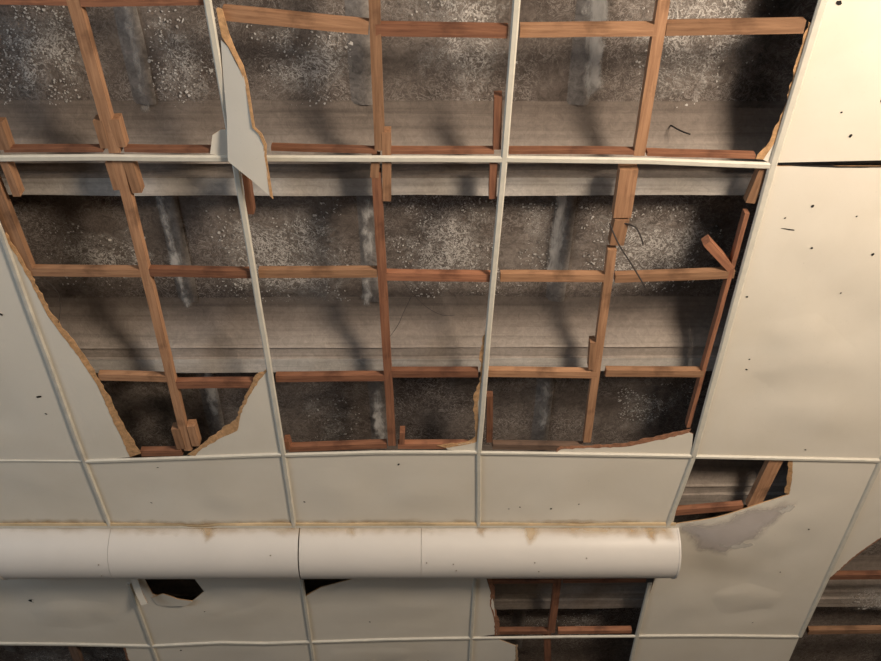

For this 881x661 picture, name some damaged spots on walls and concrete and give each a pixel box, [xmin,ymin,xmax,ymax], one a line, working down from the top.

peeling [684,505,794,551]